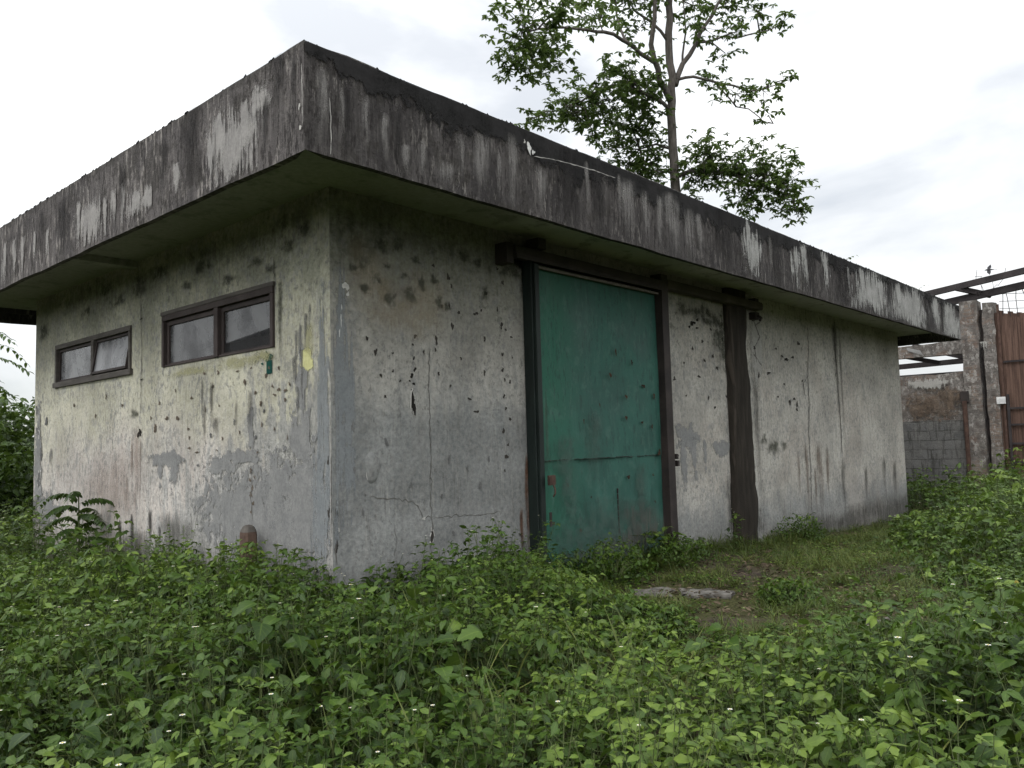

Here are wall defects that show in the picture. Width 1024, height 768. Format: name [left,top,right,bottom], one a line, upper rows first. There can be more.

damp [643,196,701,242]
spalling [380,334,438,417]
peeling [121,282,332,596]
crack [371,350,500,552]
peeling [675,422,730,492]